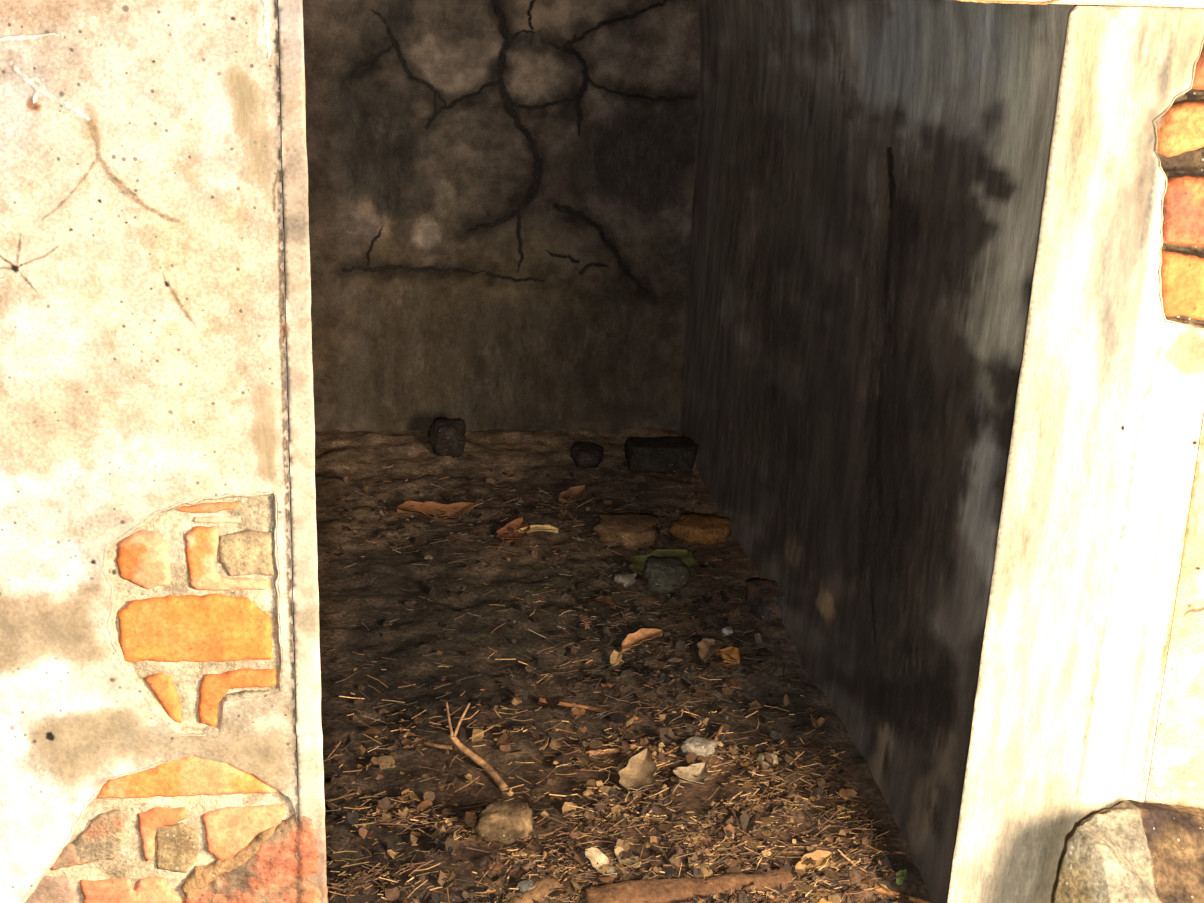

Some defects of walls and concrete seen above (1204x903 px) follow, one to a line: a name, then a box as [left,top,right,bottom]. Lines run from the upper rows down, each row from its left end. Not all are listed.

crack [0,33,176,293]
crack [342,0,694,293]
spalling [1153,38,1204,331]
crack [273,0,297,775]
crack [870,147,895,671]
water stain [0,587,103,671]
spalling [102,492,283,736]
spalling [21,753,328,903]